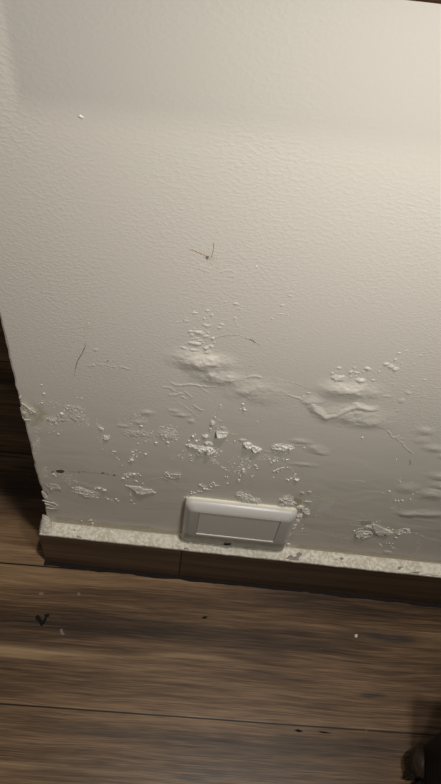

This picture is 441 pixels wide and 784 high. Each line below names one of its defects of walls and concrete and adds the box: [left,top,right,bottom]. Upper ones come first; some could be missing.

peeling [215,420,239,442]
peeling [125,471,181,501]
spalling [39,469,64,535]
peeling [353,521,423,539]